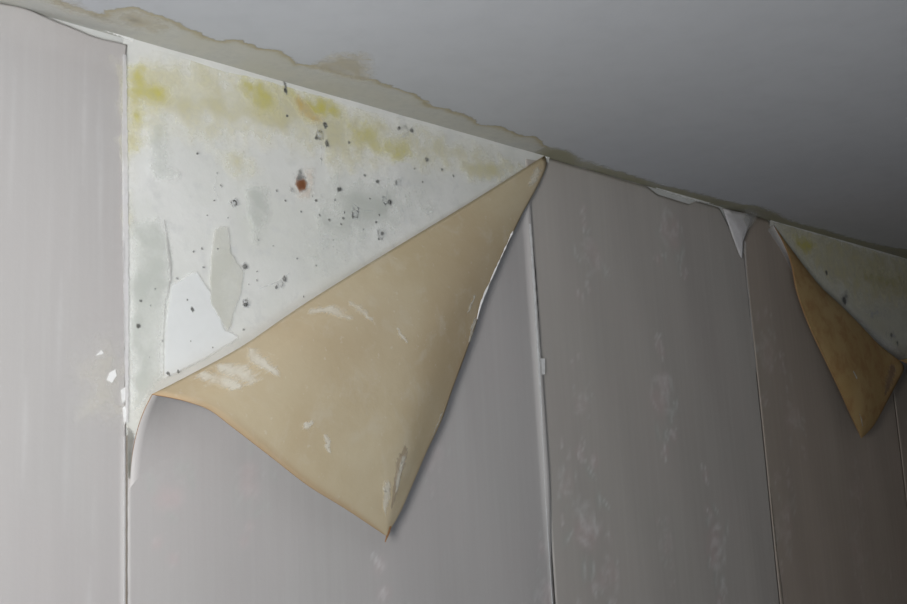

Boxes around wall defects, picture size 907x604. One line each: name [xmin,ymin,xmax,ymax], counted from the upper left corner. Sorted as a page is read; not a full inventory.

corrosion [291,170,310,194]
flaking render [122,39,550,439]
leakage [0,0,907,259]
flaking render [770,220,907,360]